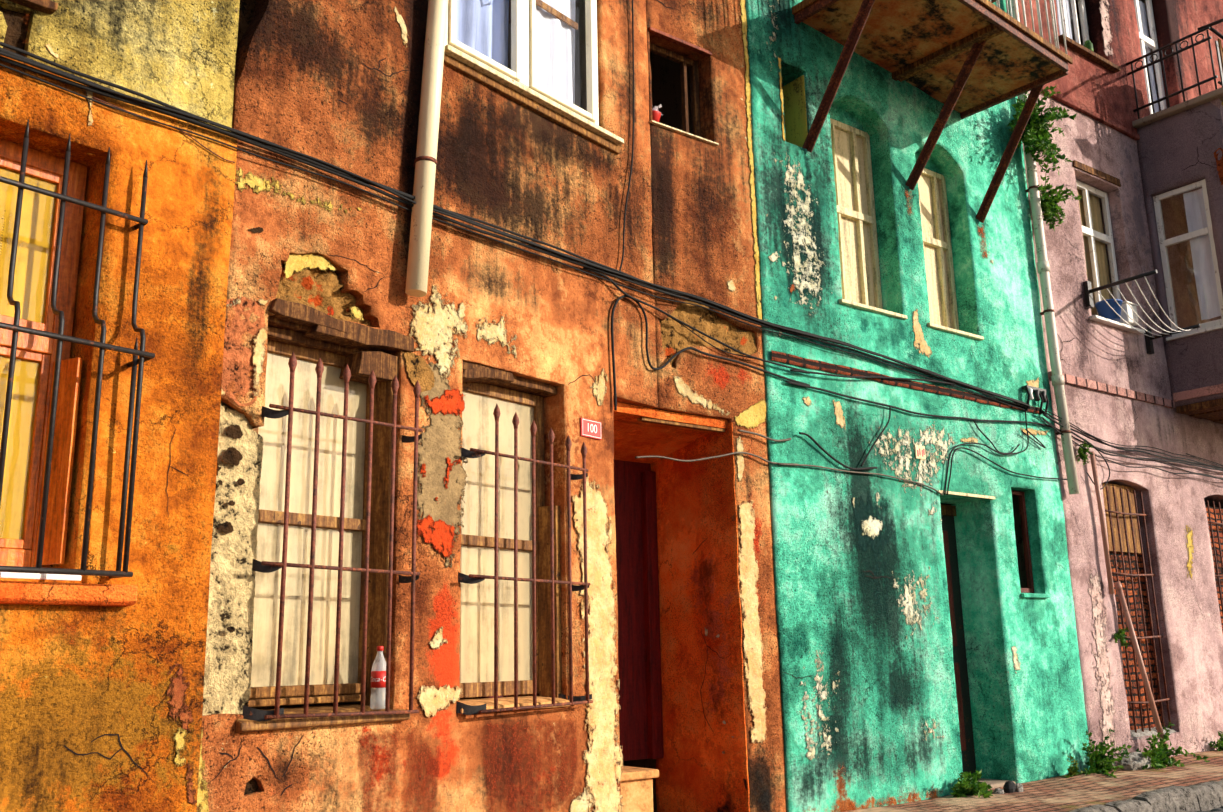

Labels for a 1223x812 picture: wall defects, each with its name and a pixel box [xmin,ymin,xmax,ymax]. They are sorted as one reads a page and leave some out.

peeling [404,285,517,568]
peeling [660,0,824,744]
peeling [832,400,846,429]
peeling [869,421,978,521]
peeling [1020,427,1049,436]
crack [64,734,153,781]
spalling [166,254,371,812]
peeling [569,476,624,812]
peeling [799,641,841,760]
leakage [851,492,897,618]
peeling [892,566,938,639]